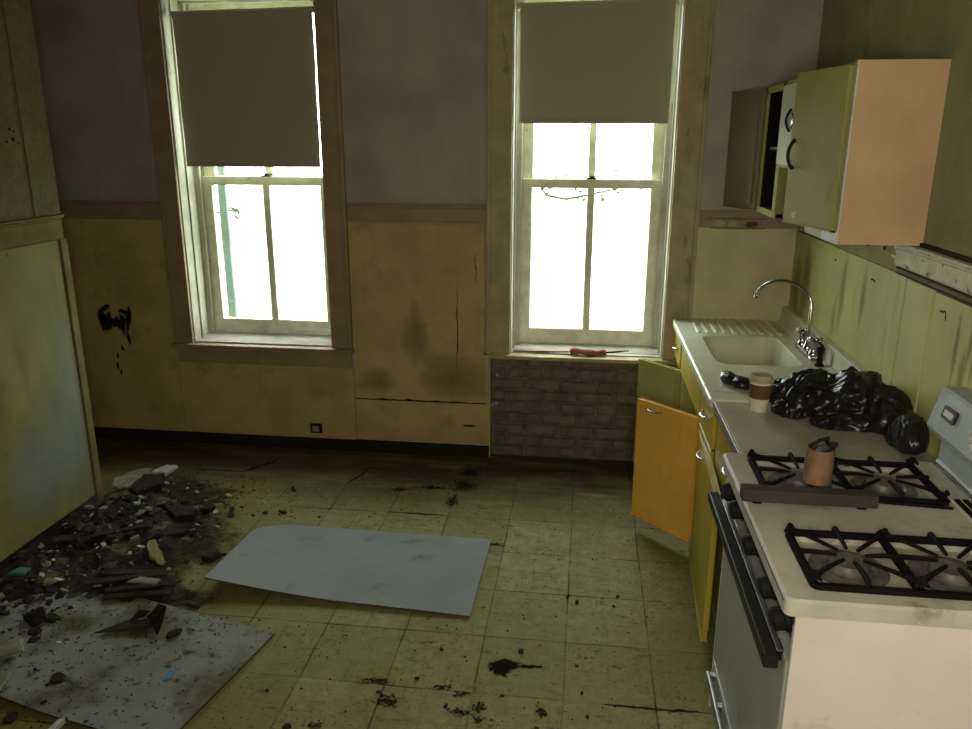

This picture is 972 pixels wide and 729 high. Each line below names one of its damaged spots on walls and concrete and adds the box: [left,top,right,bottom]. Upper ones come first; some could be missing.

leakage [97,304,131,344]